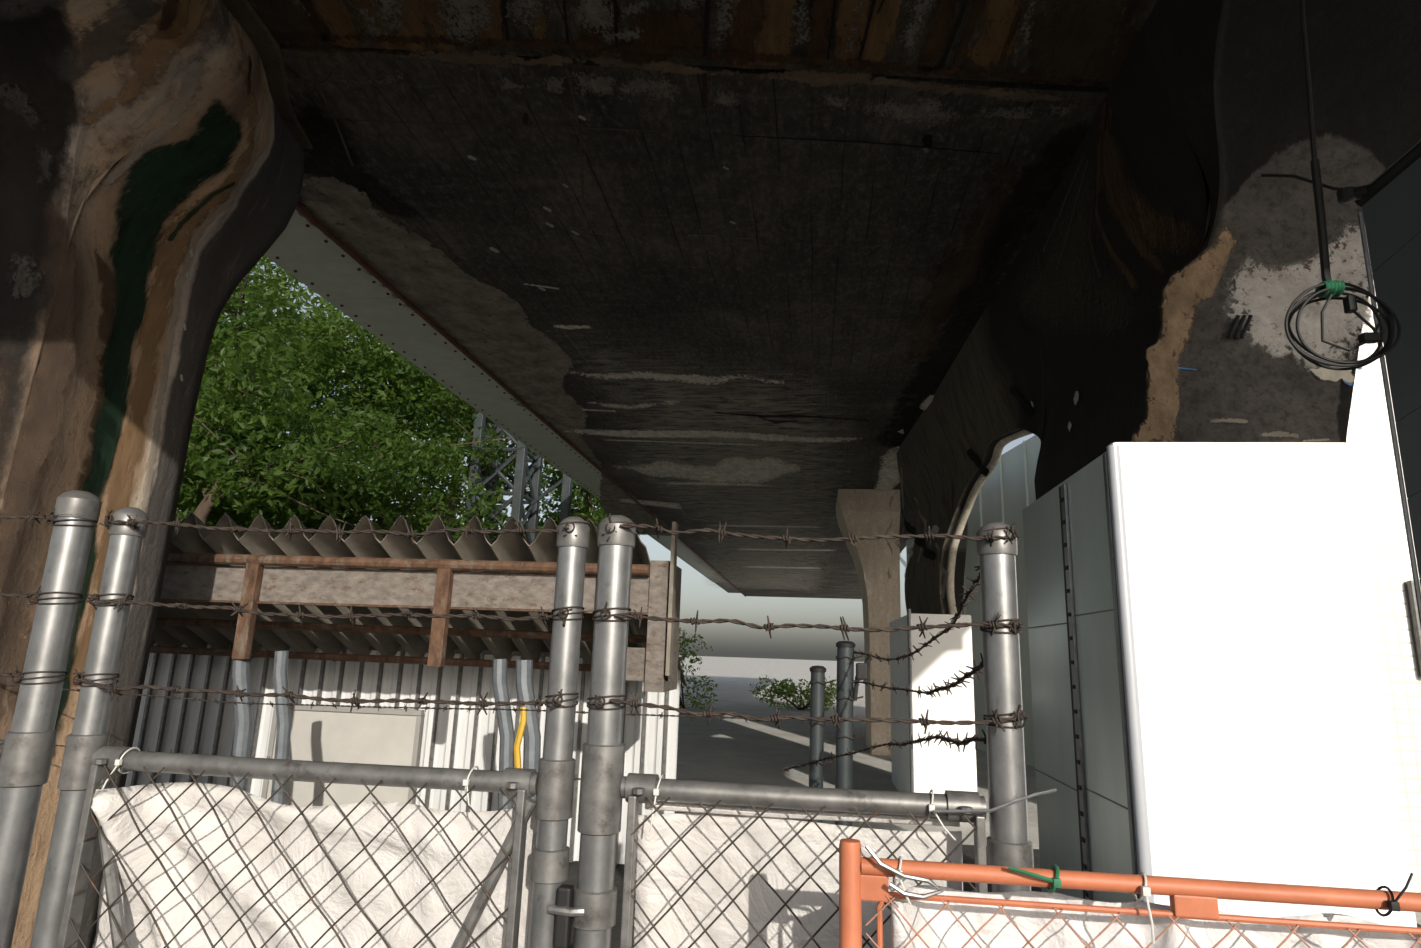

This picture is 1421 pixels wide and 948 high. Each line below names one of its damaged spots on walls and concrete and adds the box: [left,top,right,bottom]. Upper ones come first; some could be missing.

water stain [433,0,650,45]
water stain [78,54,267,512]
peeling [298,176,680,536]
water stain [562,89,1088,599]
spalling [1133,223,1375,442]
water stain [54,524,96,731]